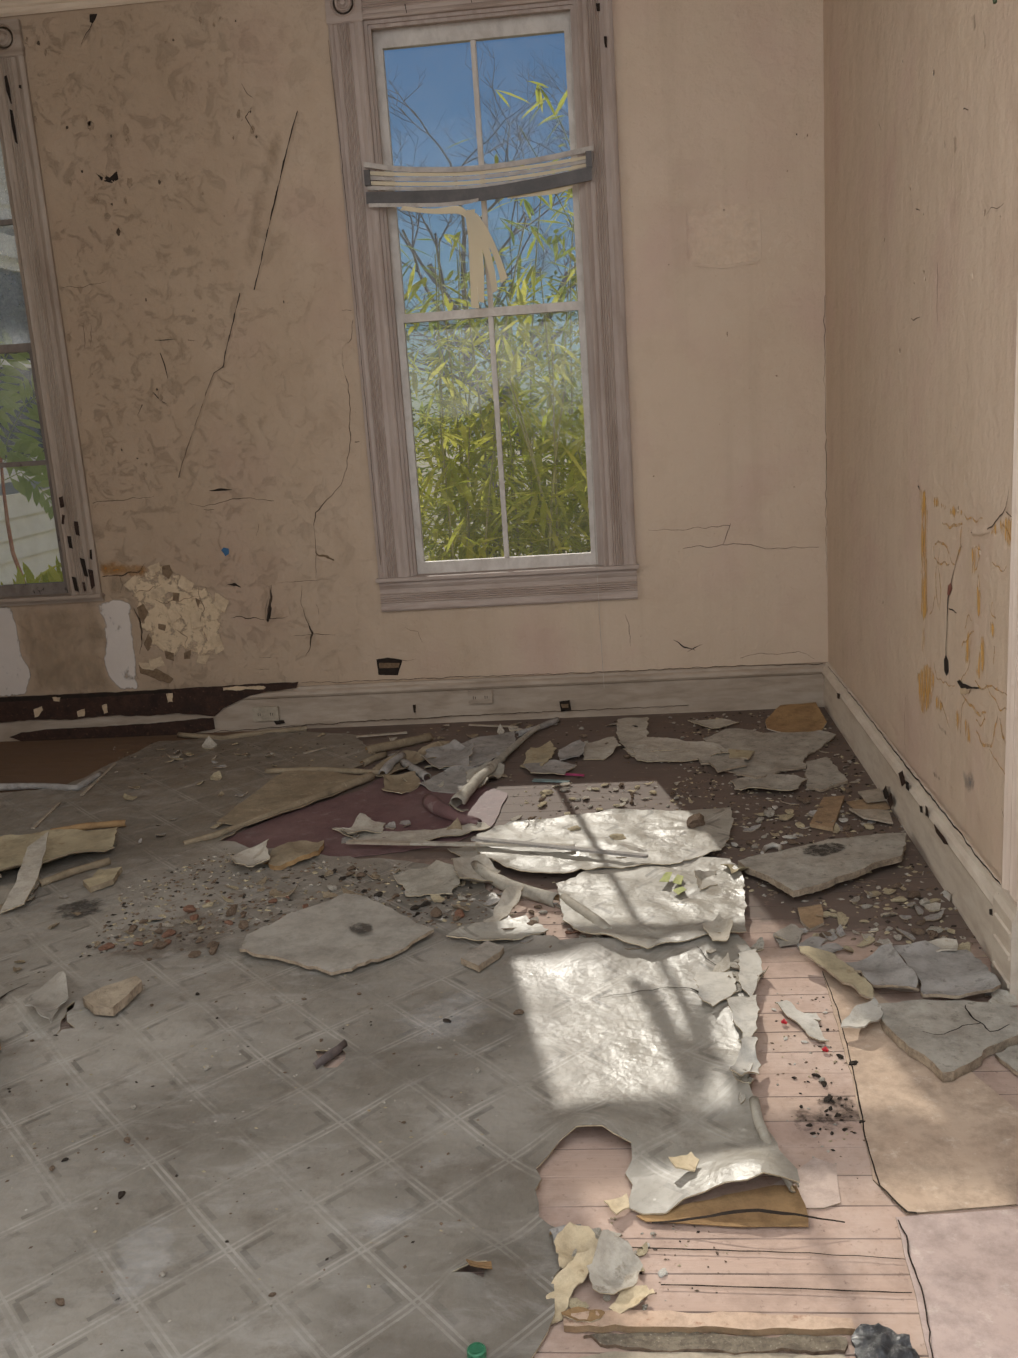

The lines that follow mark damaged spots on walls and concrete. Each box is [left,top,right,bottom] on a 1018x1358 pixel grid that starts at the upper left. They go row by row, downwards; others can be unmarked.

crack [282,41,381,655]
crack [654,298,827,570]
peeling [59,496,95,592]
peeling [0,562,298,741]
spalling [957,680,979,695]
crack [944,491,1012,676]
peeling [883,770,909,809]
peeling [919,805,948,845]